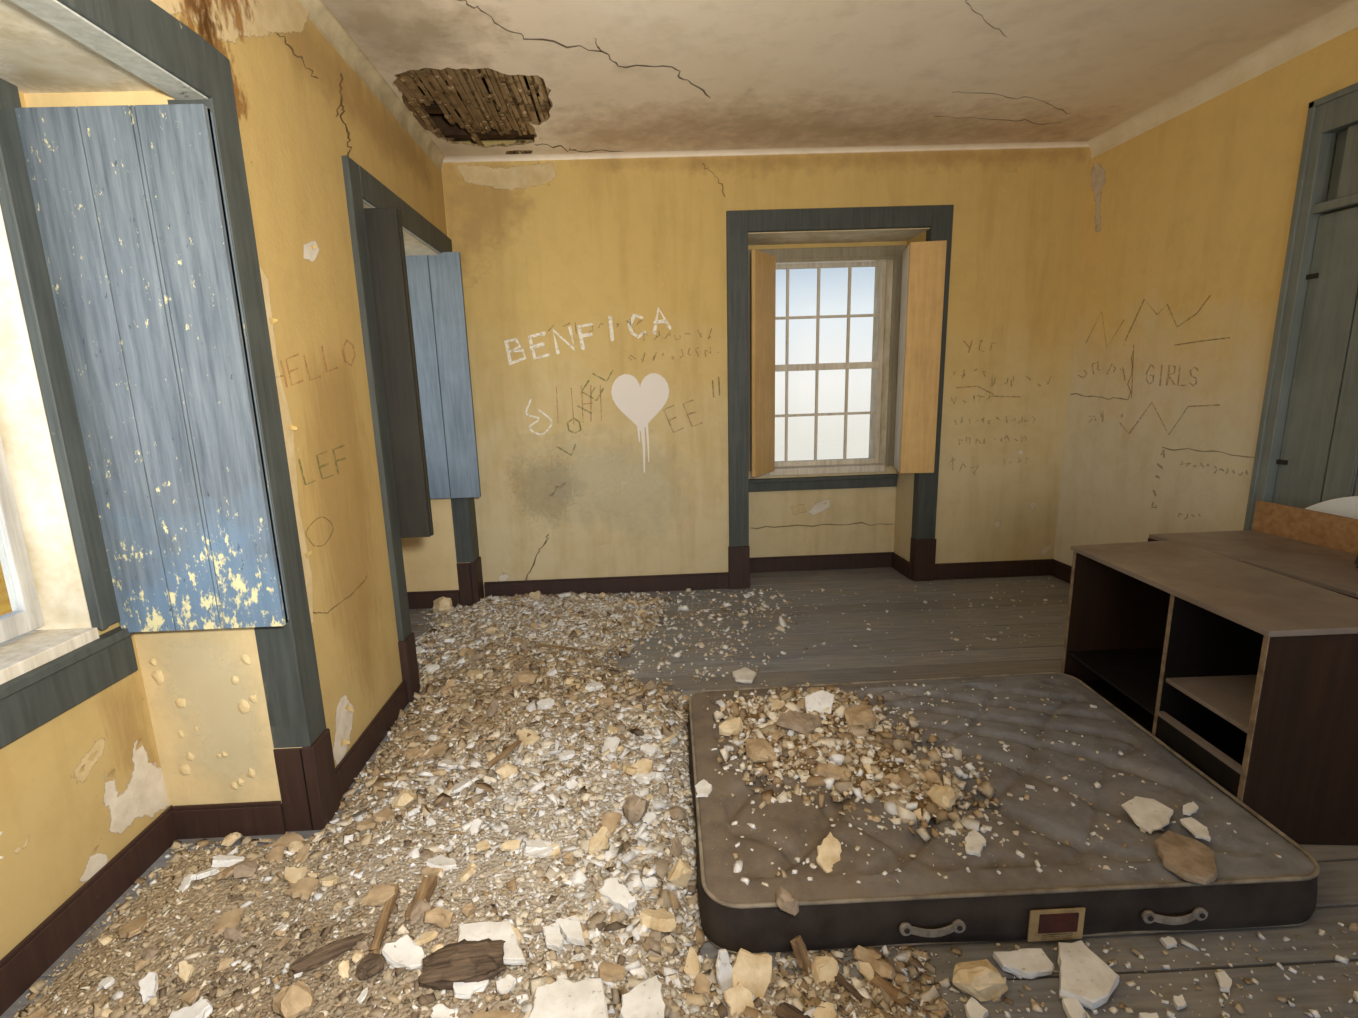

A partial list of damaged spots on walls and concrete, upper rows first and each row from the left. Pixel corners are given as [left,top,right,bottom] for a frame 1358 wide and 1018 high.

peeling [151,0,309,44]
crack [458,0,710,98]
crack [965,0,1008,38]
spalling [393,67,556,195]
crack [934,91,1070,125]
peeling [333,694,354,765]
peeling [104,738,169,834]
peeling [80,845,108,882]